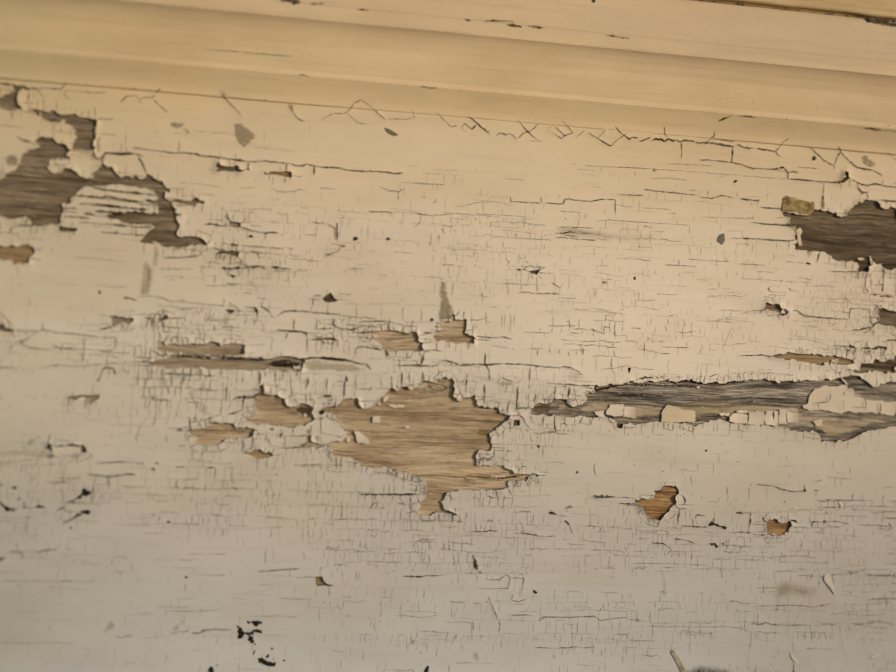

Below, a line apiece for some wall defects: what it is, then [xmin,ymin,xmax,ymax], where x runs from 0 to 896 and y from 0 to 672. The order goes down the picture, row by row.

peeling [0,85,37,111]
peeling [0,109,207,248]
peeling [782,196,896,273]
peeling [0,244,35,265]
crack [415,115,896,449]
peeling [148,341,305,372]
peeling [370,330,424,352]
peeling [433,314,475,344]
peeling [869,307,896,331]
peeling [182,344,896,521]
crack [659,572,896,631]
crack [174,610,225,634]